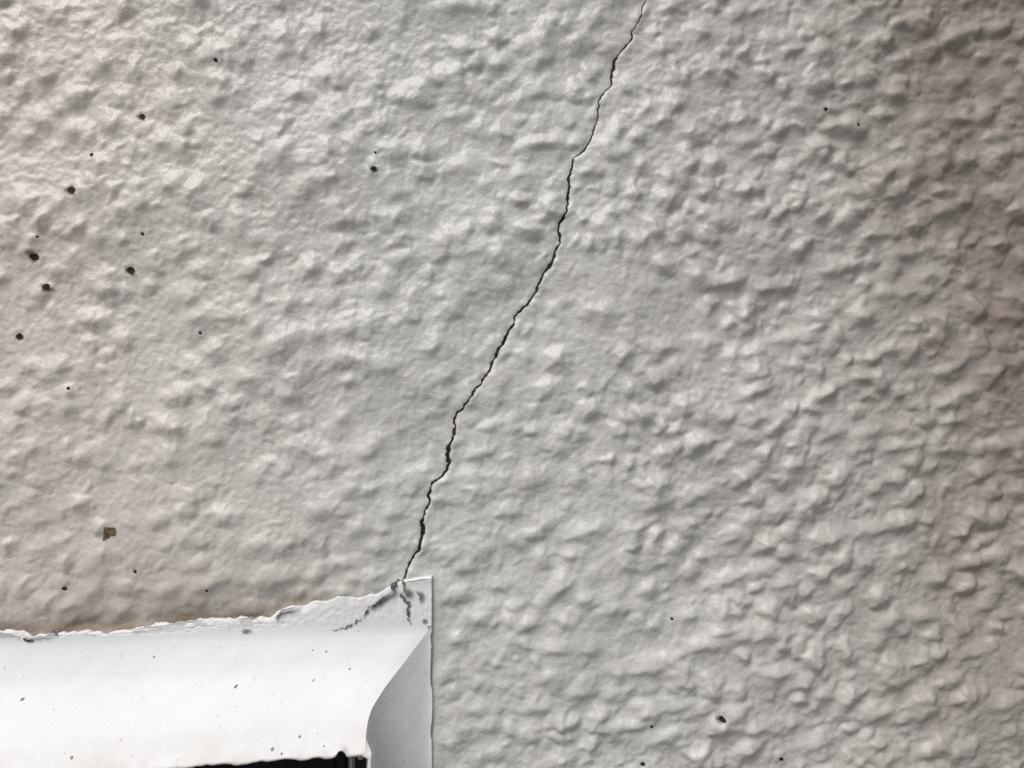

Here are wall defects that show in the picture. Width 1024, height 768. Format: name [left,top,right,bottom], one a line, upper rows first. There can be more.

crack [333,0,646,631]
peeling [374,578,431,608]
peeling [0,629,60,642]